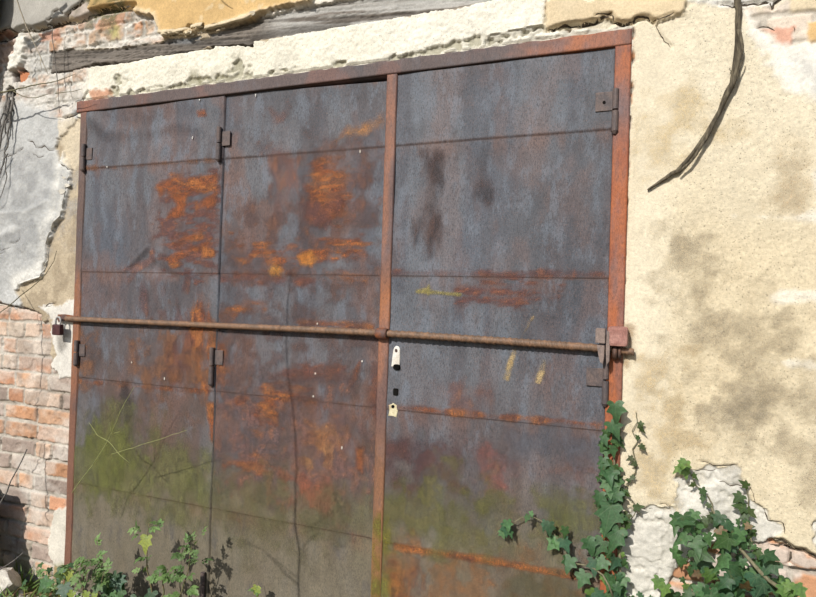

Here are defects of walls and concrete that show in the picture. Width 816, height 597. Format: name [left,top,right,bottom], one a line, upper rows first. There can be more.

spalling [0,10,257,82]
spalling [163,50,411,90]
spalling [485,17,632,48]
flaking render [19,176,70,284]
rust [129,160,241,284]
rust [297,239,365,265]
flaking render [623,464,816,597]